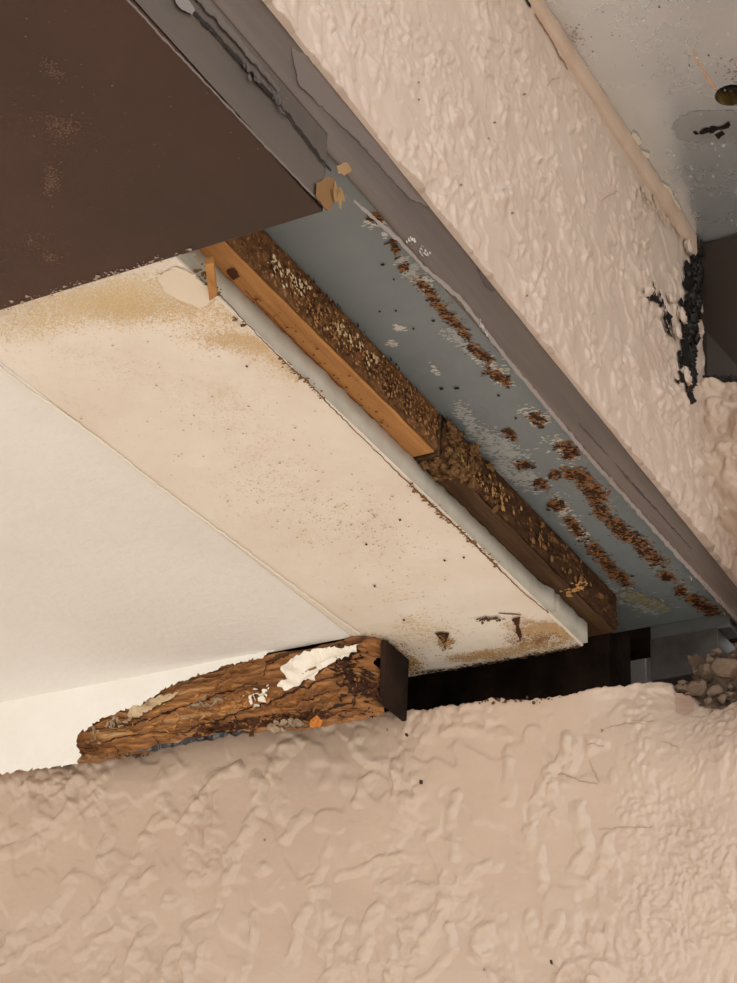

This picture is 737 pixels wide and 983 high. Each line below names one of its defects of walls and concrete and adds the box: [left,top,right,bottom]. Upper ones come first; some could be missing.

damp [671,110,737,144]
peeling [157,267,211,308]
corrosion [390,239,514,388]
damp [0,261,577,676]
corrosion [532,441,723,617]
corrosion [435,632,455,651]
corrosion [475,613,522,640]
peeling [673,654,737,716]